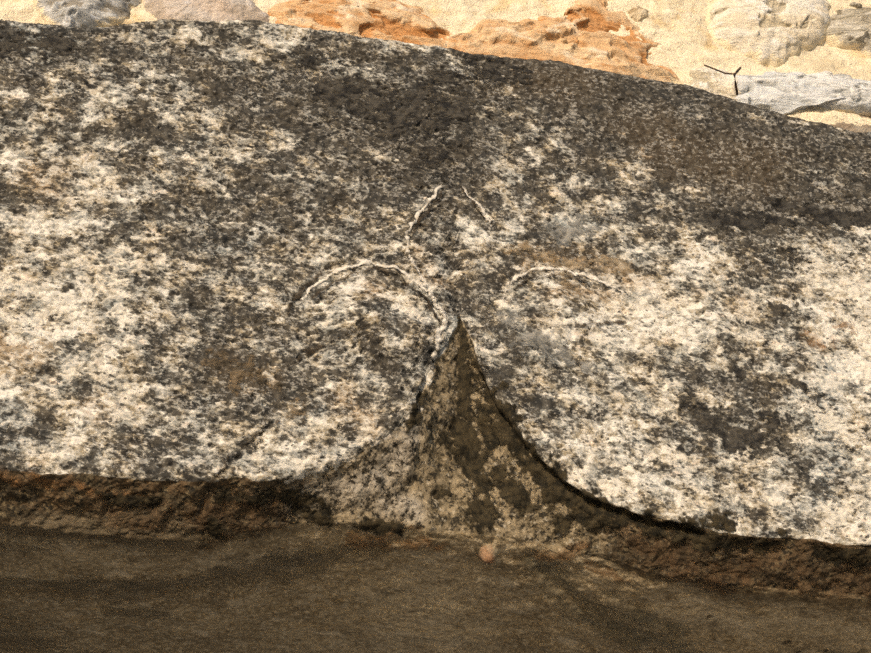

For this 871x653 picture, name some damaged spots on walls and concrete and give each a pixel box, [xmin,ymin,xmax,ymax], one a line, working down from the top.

crack [284,263,340,315]
crack [546,320,624,333]
spalling [255,444,329,482]